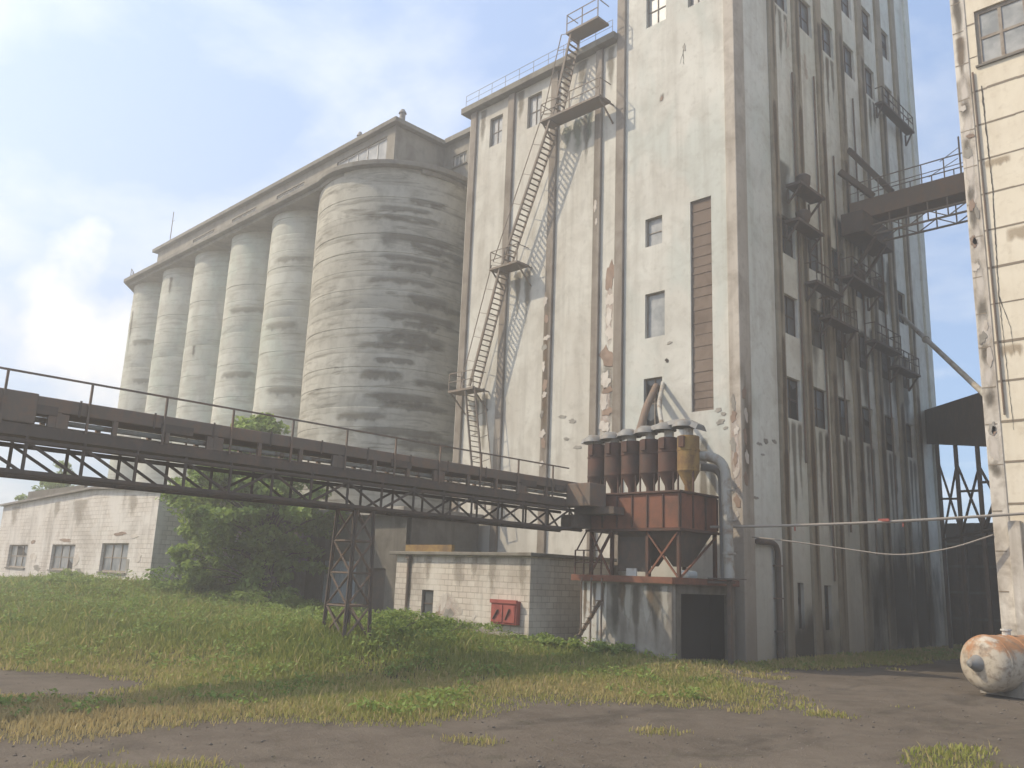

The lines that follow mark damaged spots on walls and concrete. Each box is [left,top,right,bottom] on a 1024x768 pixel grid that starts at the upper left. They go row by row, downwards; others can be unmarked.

water stain [370,199,443,224]
water stain [340,380,456,453]
water stain [361,233,463,380]
flaking render [539,297,576,466]
flaking render [598,260,614,443]
flaking render [715,386,777,521]
water stain [810,219,909,415]